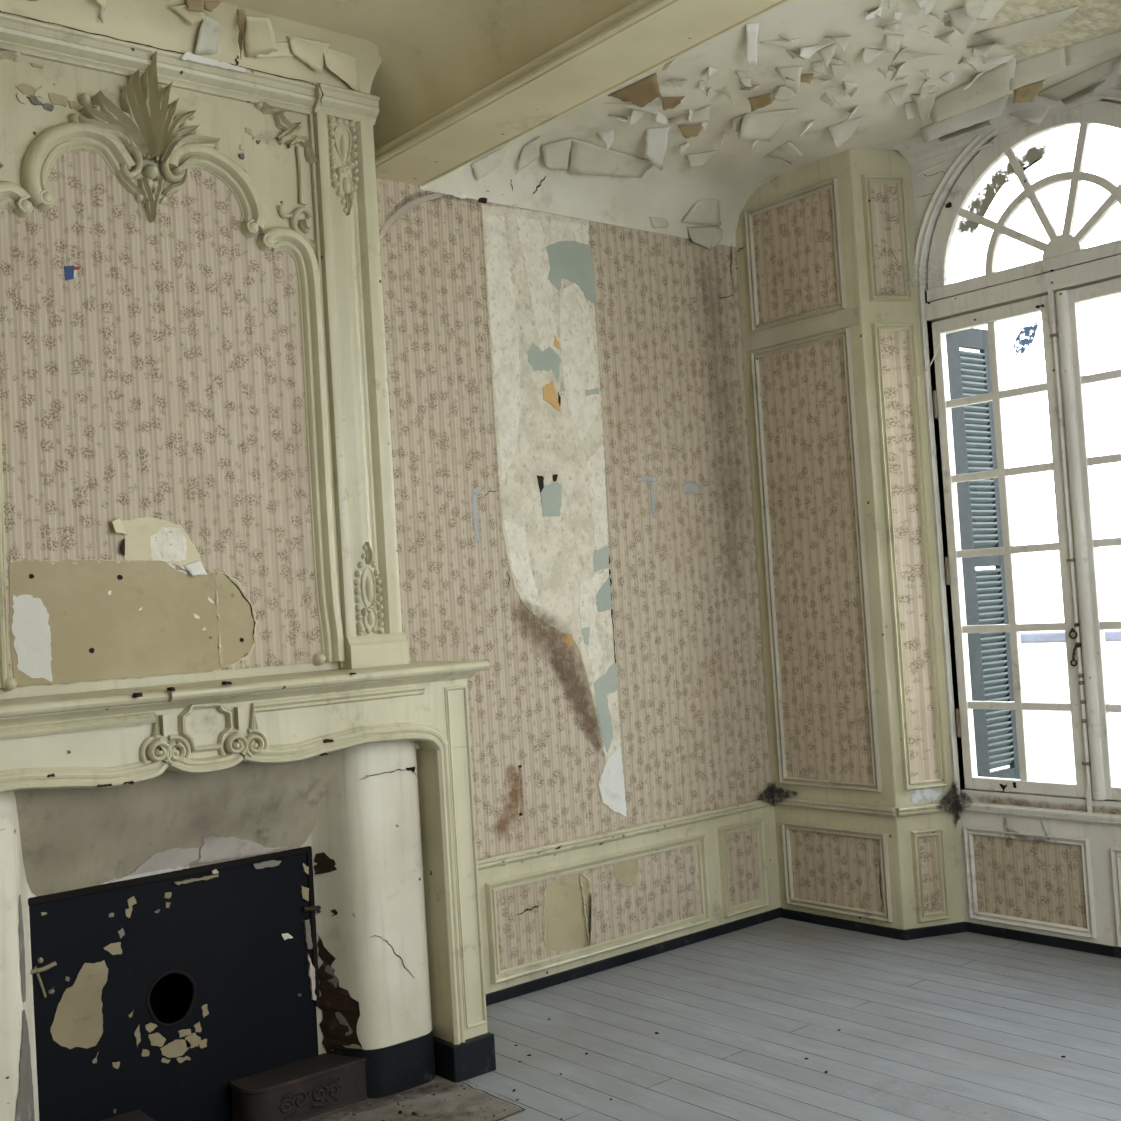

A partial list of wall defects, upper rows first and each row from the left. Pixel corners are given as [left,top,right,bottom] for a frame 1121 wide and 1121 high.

peeling [515,0,1121,178]
peeling [470,146,507,180]
peeling [683,200,723,249]
flaking render [425,188,621,762]
flaking render [8,559,254,691]
damp [519,603,601,750]
flaking render [38,836,287,913]
flaking render [16,894,35,1121]
peeling [50,896,137,1063]
peeling [129,1004,209,1064]